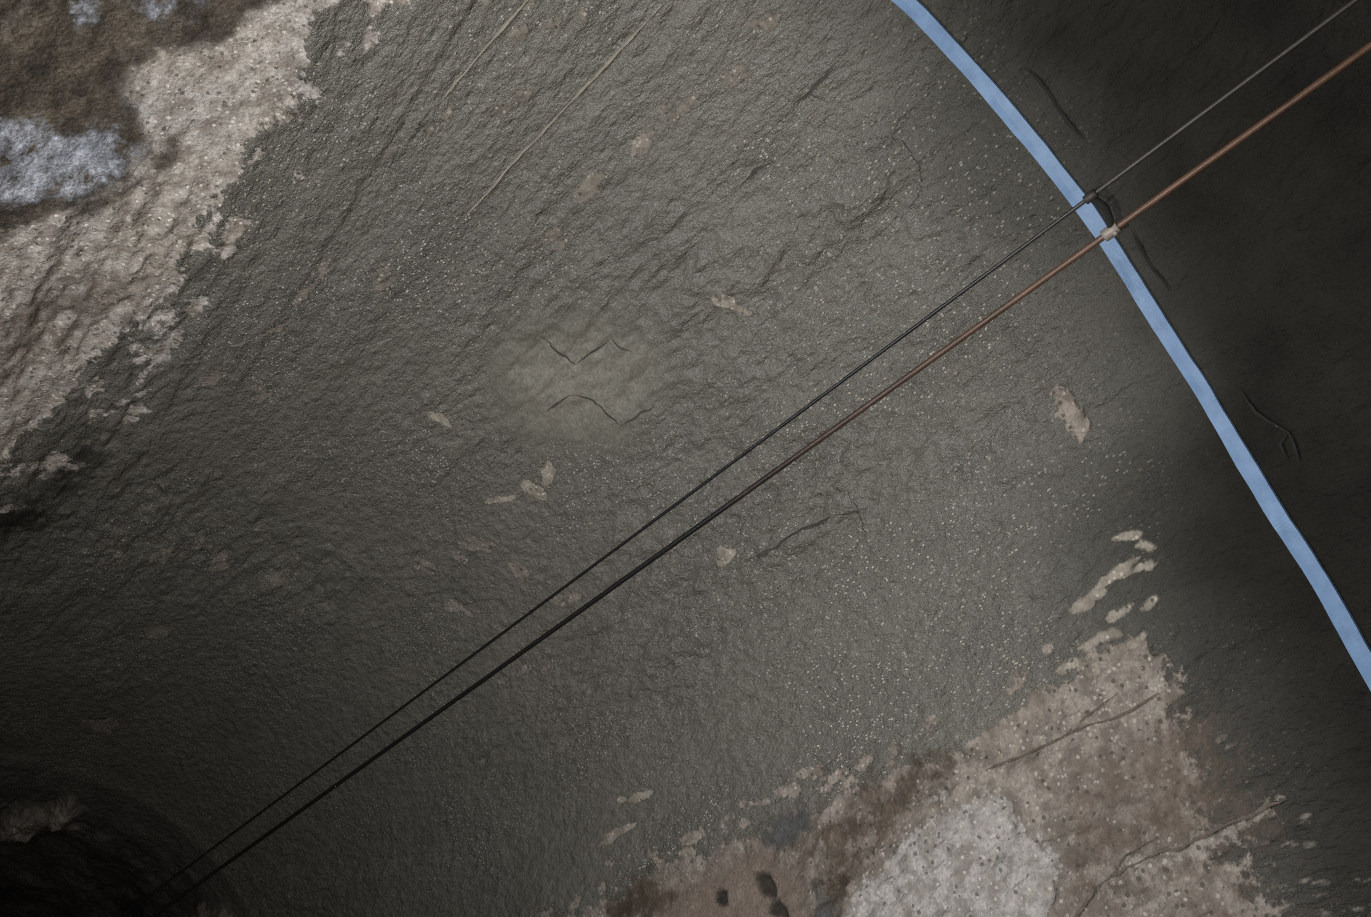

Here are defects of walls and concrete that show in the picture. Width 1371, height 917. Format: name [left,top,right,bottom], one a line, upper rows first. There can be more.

peeling [336,0,411,56]
damp [0,0,277,233]
peeling [0,0,339,481]
peeling [428,411,452,427]
peeling [0,504,28,513]
peeling [450,536,530,581]
peeling [539,531,1330,917]